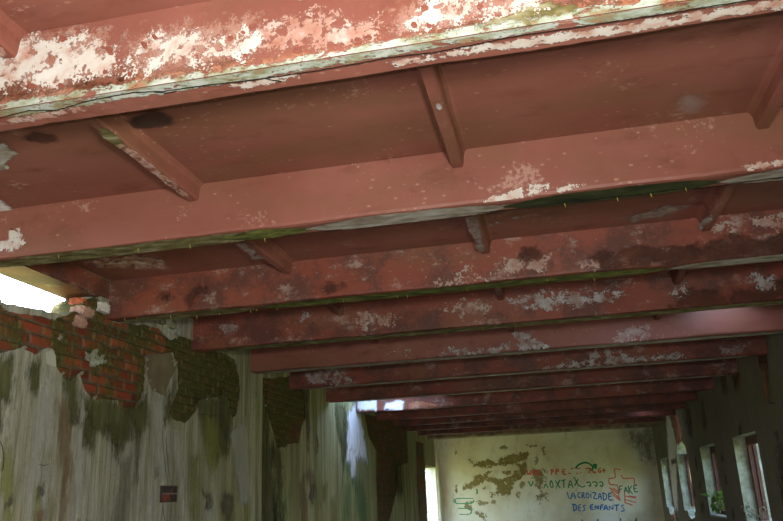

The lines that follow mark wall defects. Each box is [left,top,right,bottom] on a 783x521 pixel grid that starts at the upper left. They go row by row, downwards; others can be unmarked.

peeling [0,0,553,108]
peeling [386,0,783,67]
damp [129,112,172,128]
peeling [0,228,26,252]
corrosion [519,247,542,261]
corrosion [593,231,783,271]
corrosion [668,279,783,310]
damp [85,349,107,367]
spalling [0,297,240,425]
damp [26,350,85,521]
damp [152,398,250,521]
peeling [455,444,546,520]